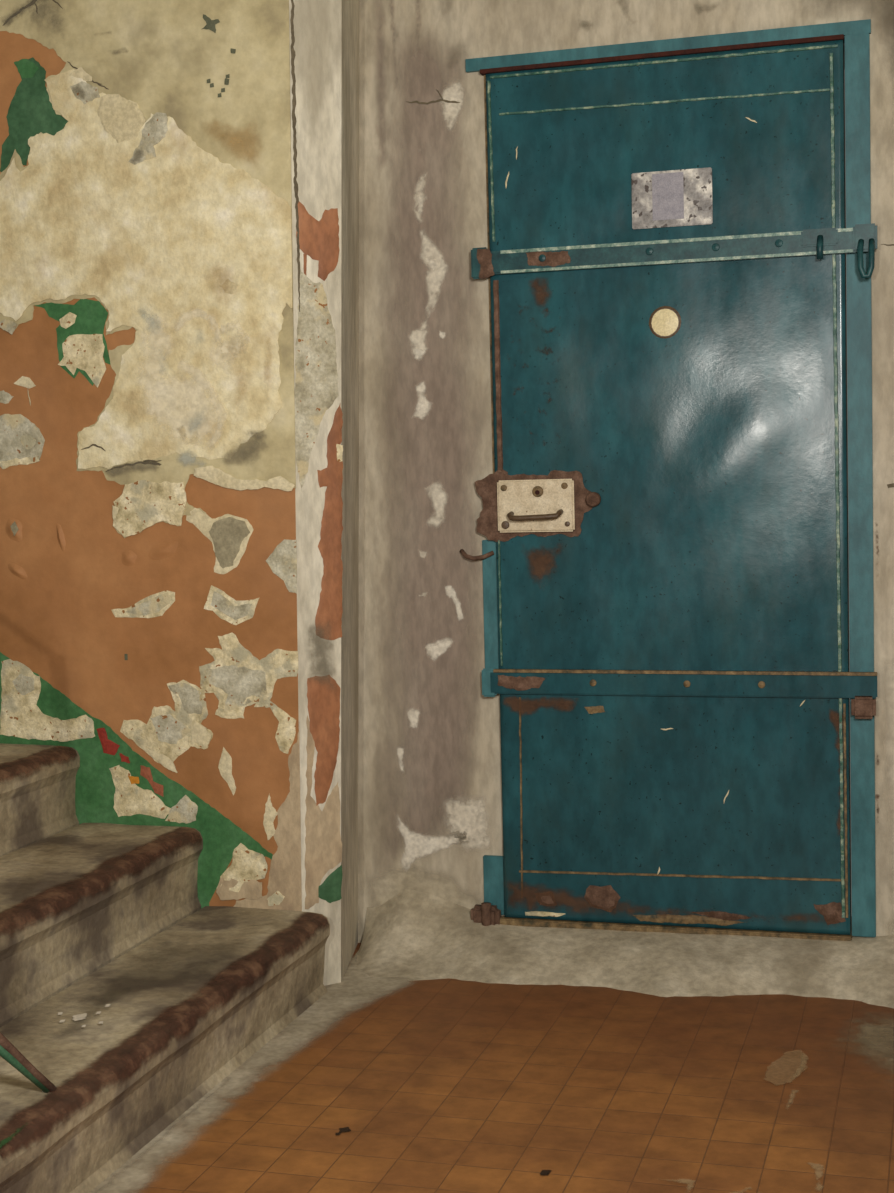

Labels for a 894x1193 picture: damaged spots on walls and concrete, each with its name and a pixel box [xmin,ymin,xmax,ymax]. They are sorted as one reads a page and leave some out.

flaking render [0,0,343,911]
rust [494,470,593,542]
rust [528,551,558,578]
rust [510,884,643,913]
rust [790,902,846,925]